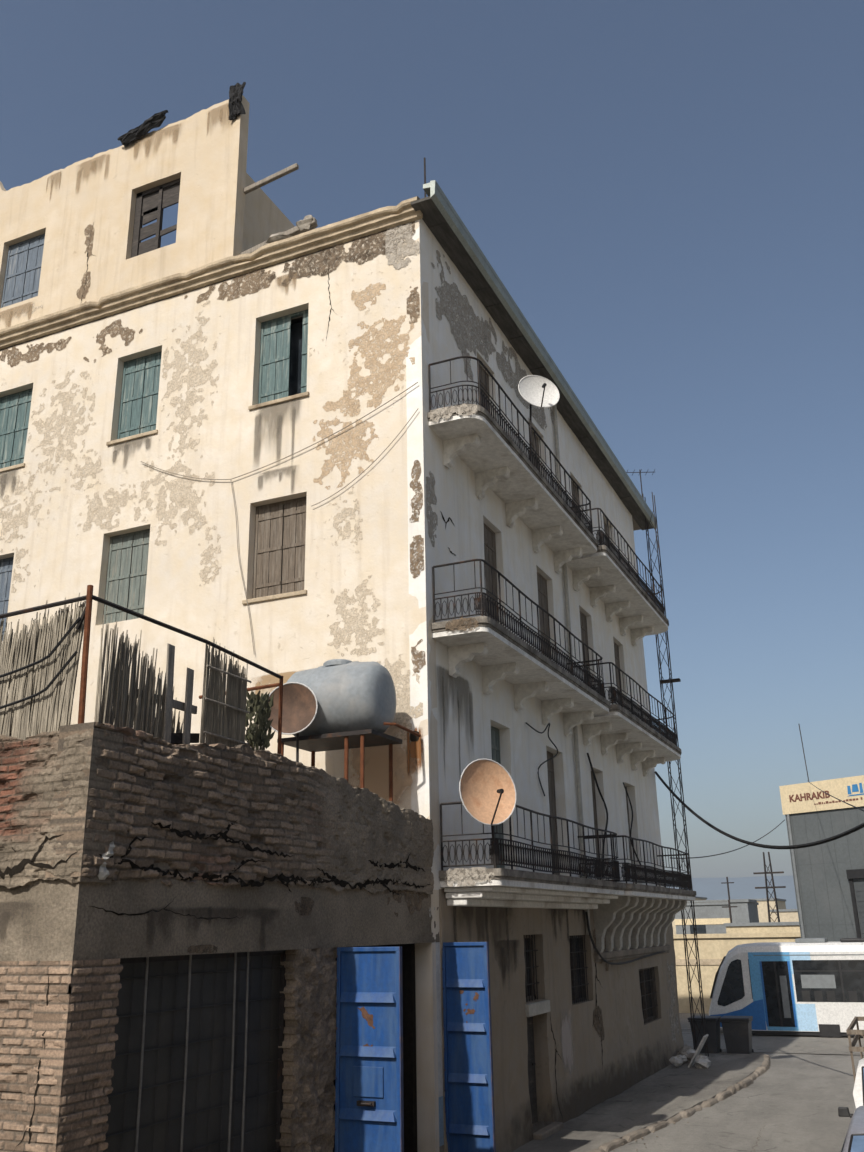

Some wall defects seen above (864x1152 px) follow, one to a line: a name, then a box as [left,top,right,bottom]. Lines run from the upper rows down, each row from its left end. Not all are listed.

water stain [46,171,61,198]
water stain [76,154,109,191]
water stain [132,124,178,157]
water stain [207,103,229,130]
spalling [430,250,553,431]
peeling [0,221,420,593]
spalling [409,460,438,578]
peeling [327,575,426,740]
crack [0,820,430,920]
crack [17,970,49,1146]
rust [358,1006,375,1029]
rust [455,987,479,1023]